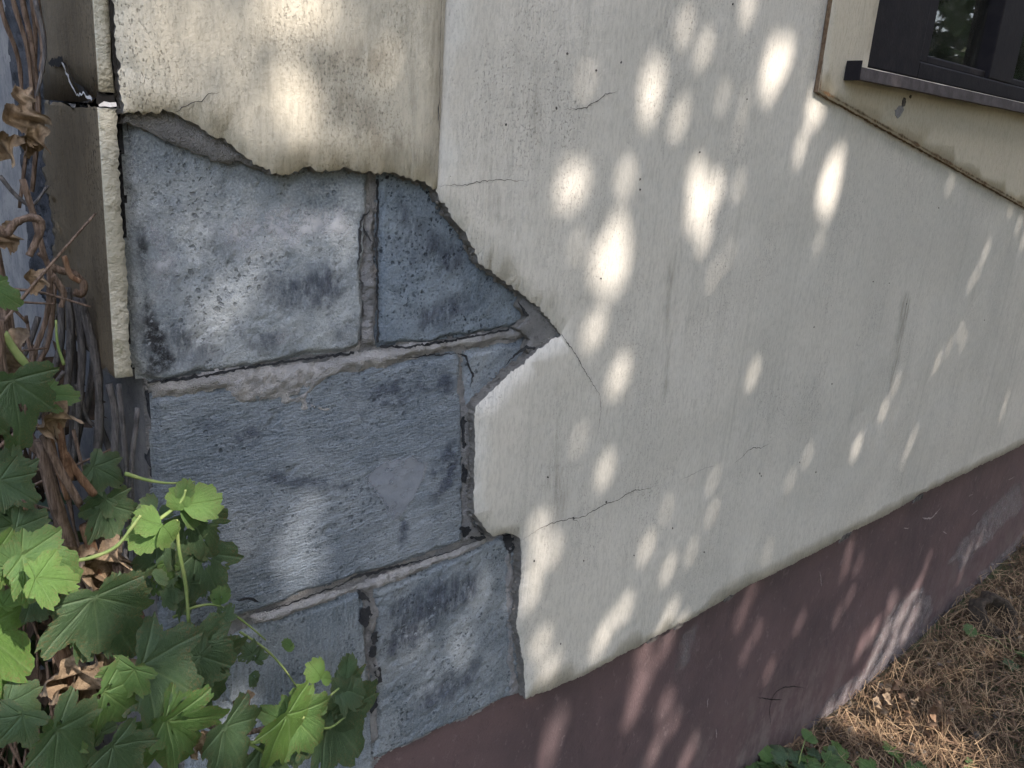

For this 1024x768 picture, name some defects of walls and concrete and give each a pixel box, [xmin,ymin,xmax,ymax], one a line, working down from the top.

crack [438,97,523,186]
crack [147,179,535,387]
spalling [117,109,559,768]